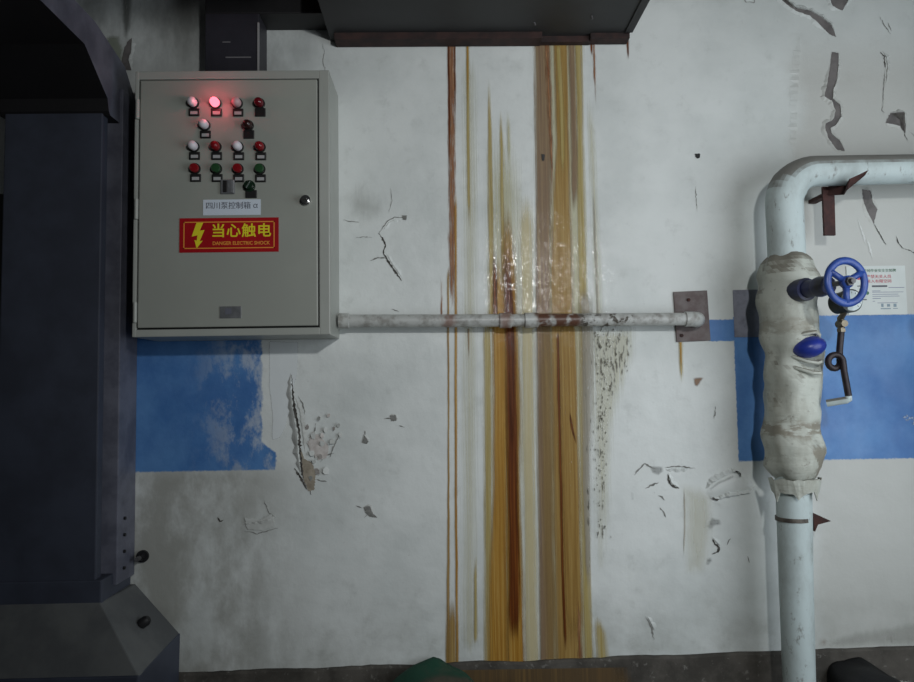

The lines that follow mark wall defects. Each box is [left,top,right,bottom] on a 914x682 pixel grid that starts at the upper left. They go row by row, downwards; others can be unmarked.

crack [346,188,407,281]
rust [441,46,470,314]
rust [488,45,598,314]
flaking render [776,0,851,37]
flaking render [820,52,845,152]
crack [880,18,891,112]
flaking render [885,109,908,139]
peeling [286,373,342,494]
leakage [586,326,629,536]
rust [446,326,627,682]